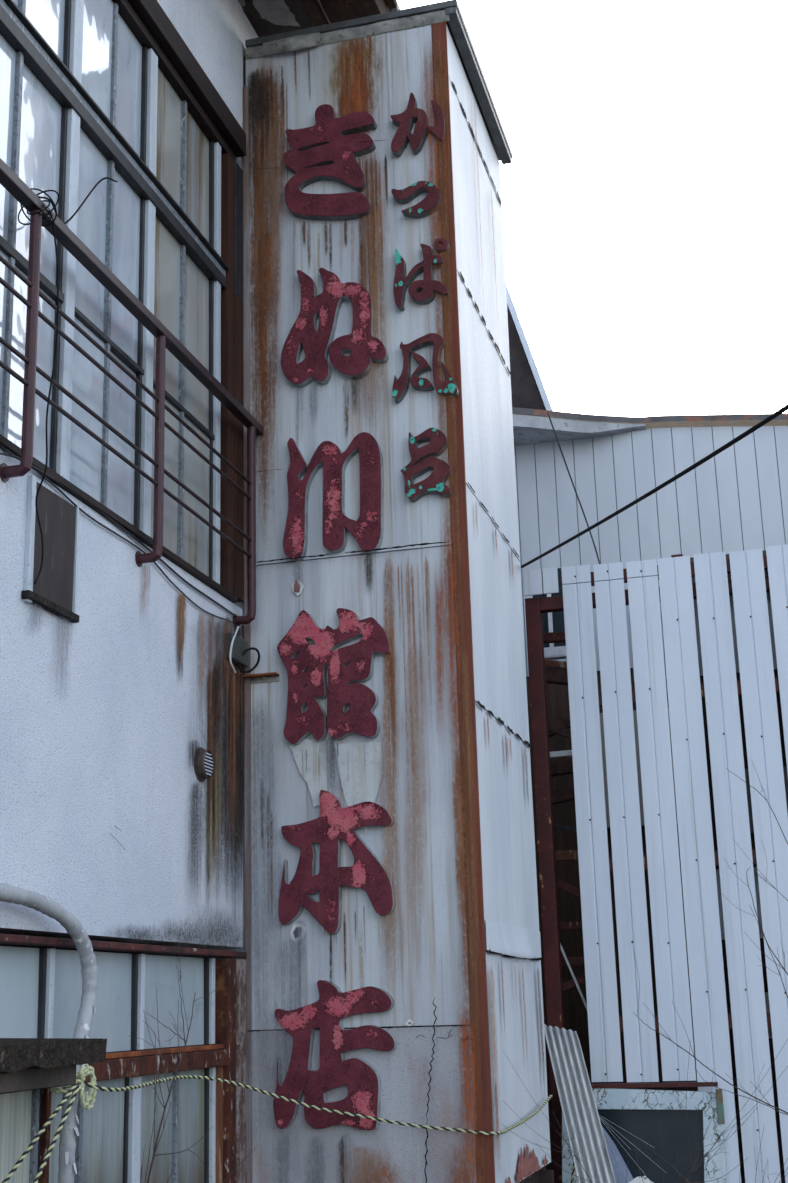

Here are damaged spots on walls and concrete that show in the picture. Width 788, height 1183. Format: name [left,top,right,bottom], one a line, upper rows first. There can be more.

peeling [238,0,300,26]
corrosion [331,36,380,116]
corrosion [251,73,288,467]
corrosion [358,153,388,342]
corrosion [383,43,544,1183]
leakage [117,623,280,1013]
leakage [324,906,389,988]
crack [379,998,468,1183]
peeling [507,1144,548,1183]